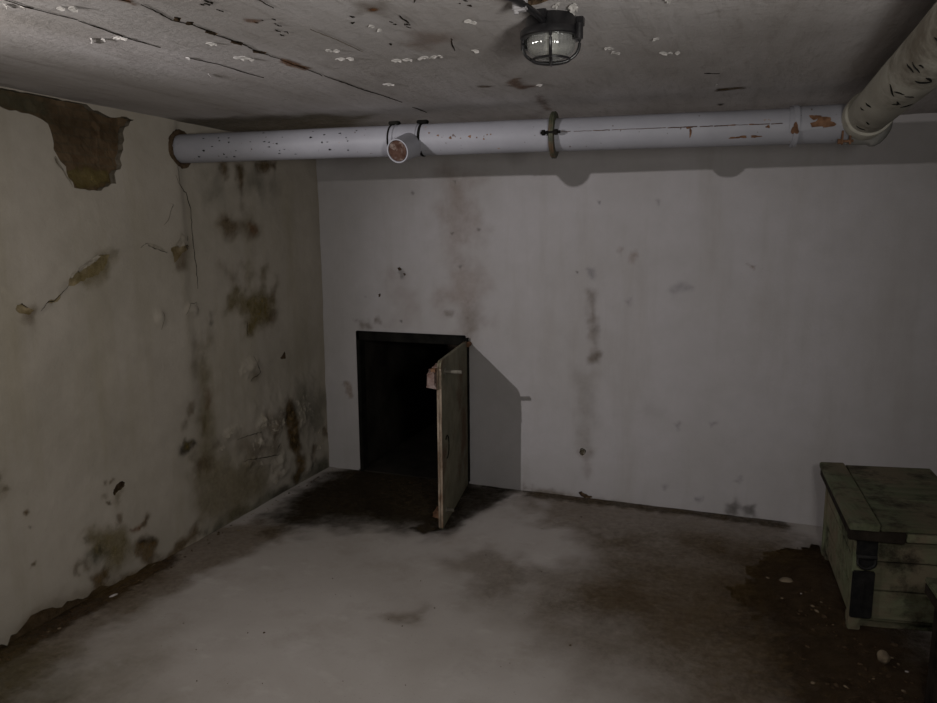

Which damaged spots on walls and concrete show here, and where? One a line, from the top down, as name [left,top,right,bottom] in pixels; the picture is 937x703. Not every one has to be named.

flaking render [0,88,133,191]
corrosion [809,115,836,128]
flaking render [0,527,197,647]